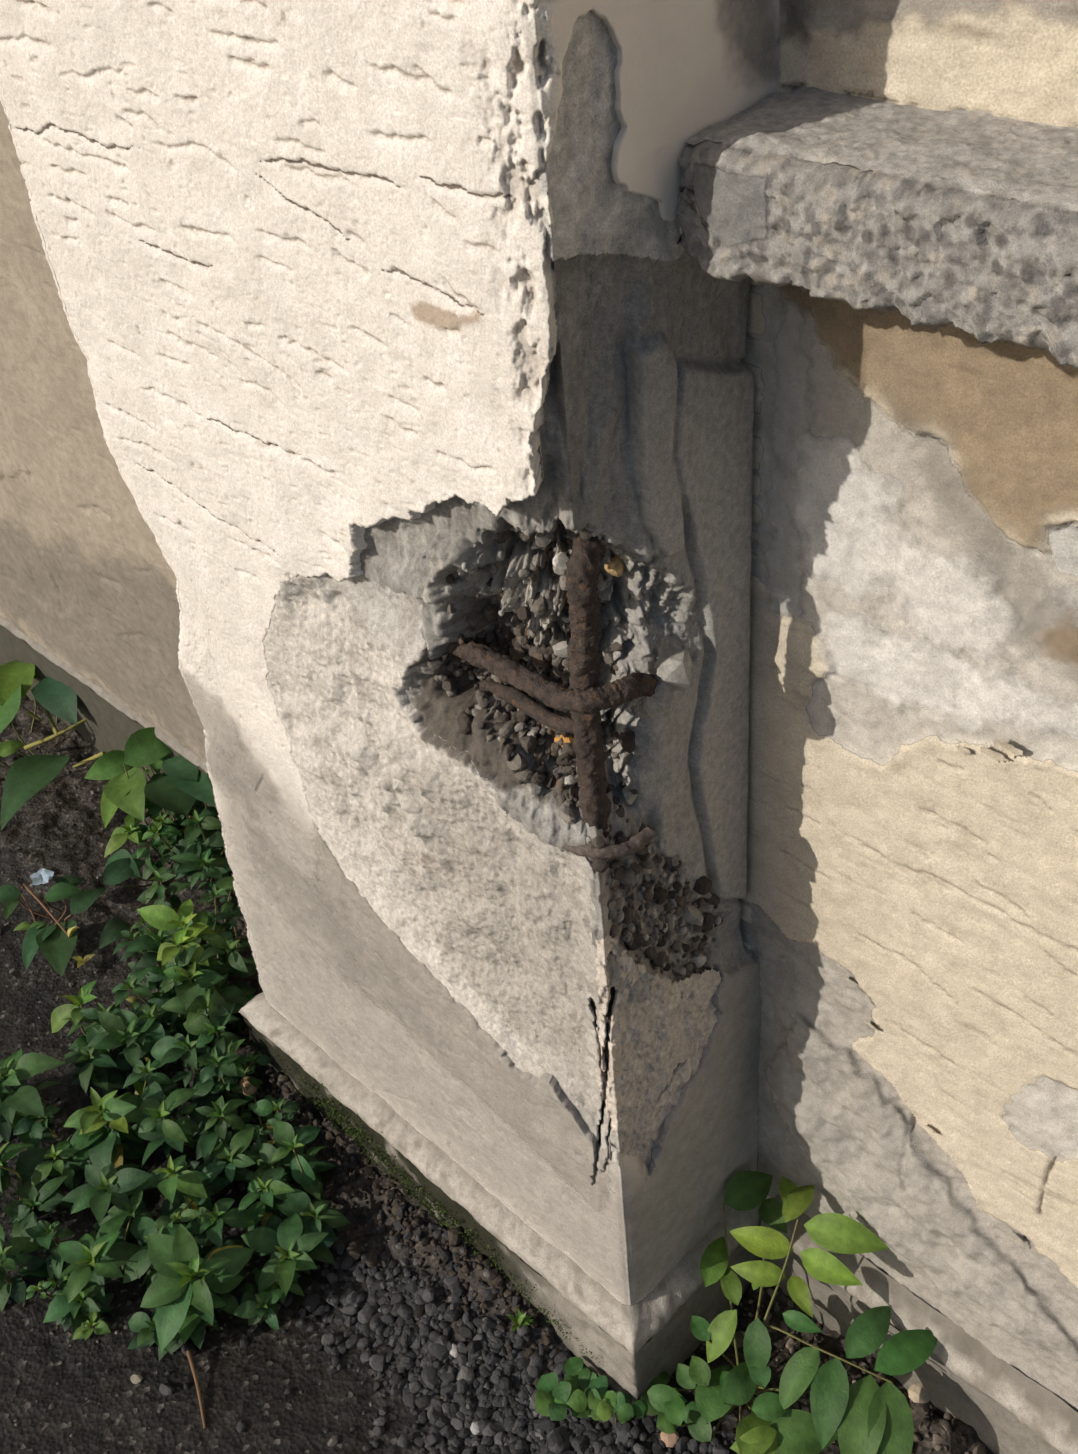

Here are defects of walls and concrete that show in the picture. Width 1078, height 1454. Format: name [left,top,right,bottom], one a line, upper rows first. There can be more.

crack [16,123,133,150]
crack [259,158,512,240]
crack [139,240,213,267]
crack [381,268,484,315]
corrosion [415,665,520,790]
spalling [263,11,1078,1412]
crack [590,986,616,1163]